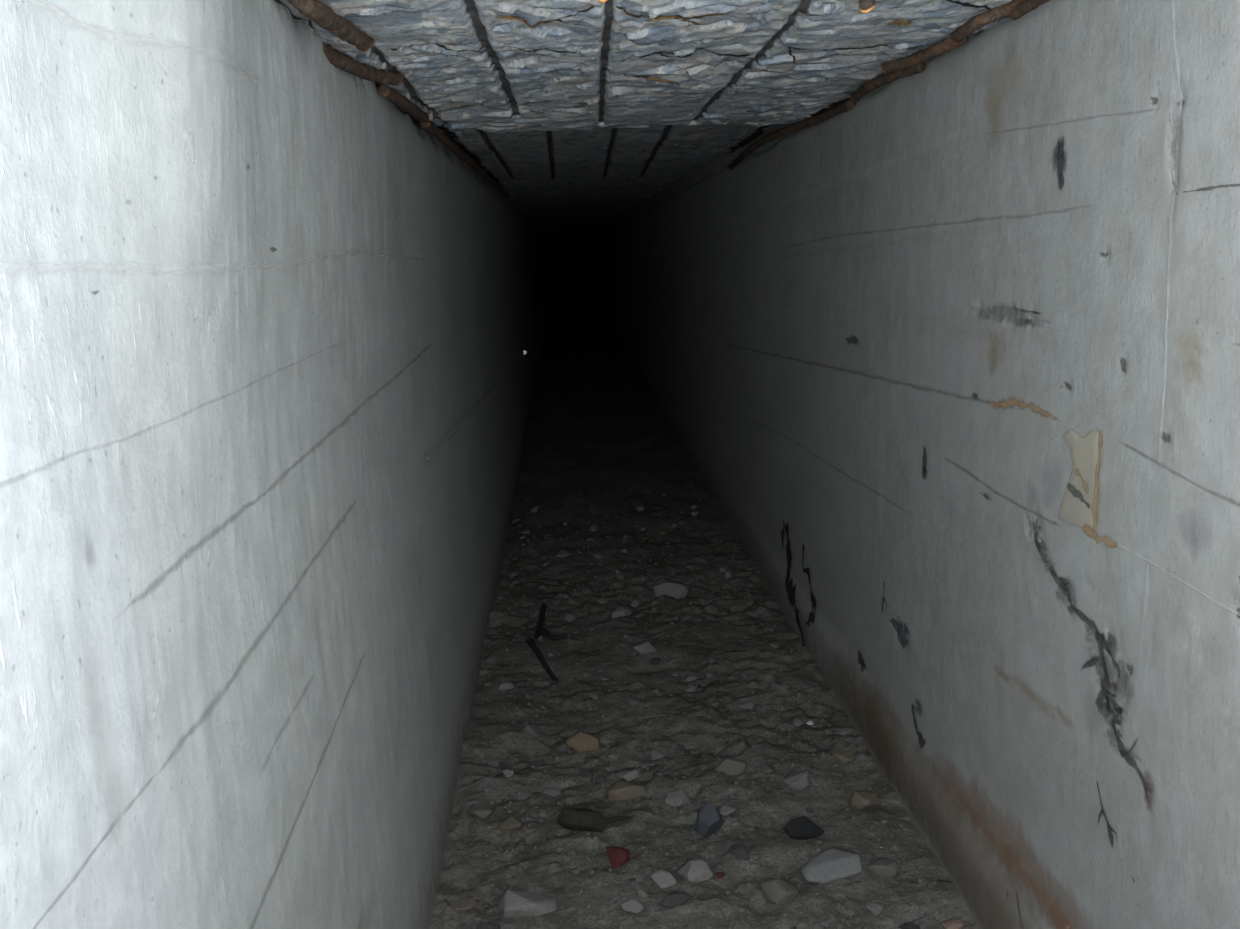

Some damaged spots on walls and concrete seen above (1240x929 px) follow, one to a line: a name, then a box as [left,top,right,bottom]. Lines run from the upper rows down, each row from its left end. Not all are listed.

spalling [287,0,429,123]
crack [375,82,503,188]
crack [436,6,753,86]
crack [728,124,778,155]
crack [809,85,882,116]
crack [788,45,924,64]
spalling [728,0,1050,170]
crack [947,0,1010,38]
crack [1171,172,1240,194]
crack [781,520,816,645]
crack [1034,529,1151,794]
crack [1097,782,1117,846]